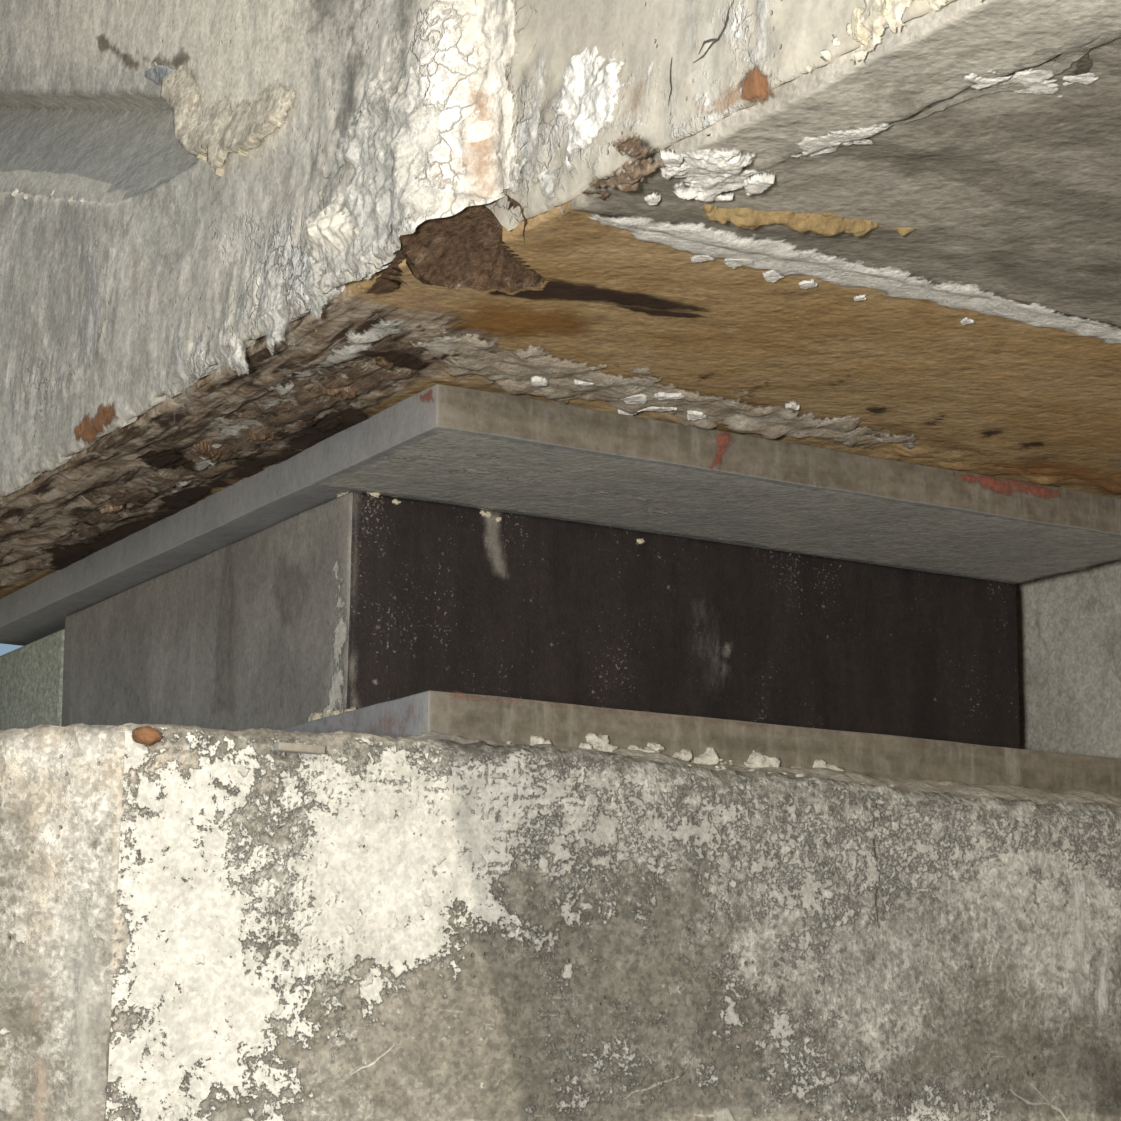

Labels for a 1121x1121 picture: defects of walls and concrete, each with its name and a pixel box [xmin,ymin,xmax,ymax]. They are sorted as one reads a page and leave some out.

spalling [0,62,296,205]
damp [472,46,626,212]
rust [721,65,773,104]
damp [754,0,771,61]
damp [489,281,707,318]
rust [74,403,116,445]
damp [43,407,372,570]
damp [357,329,918,449]
damp [321,430,1121,583]
peeling [105,727,1121,1121]